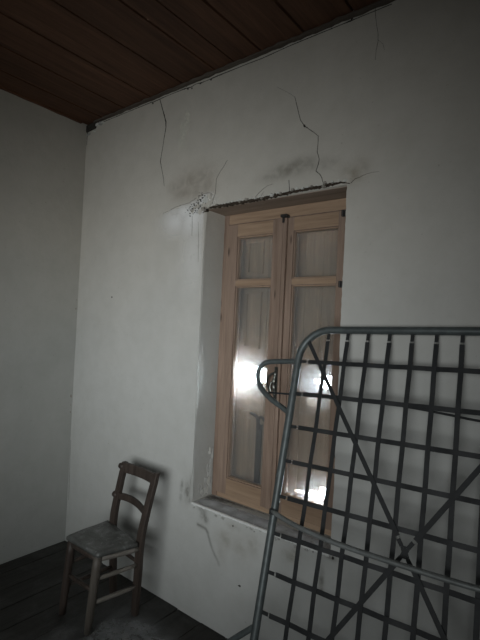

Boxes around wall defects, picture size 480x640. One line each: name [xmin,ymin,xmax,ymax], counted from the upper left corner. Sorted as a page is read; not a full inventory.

crack [289,93,324,185]
spalling [187,179,350,217]